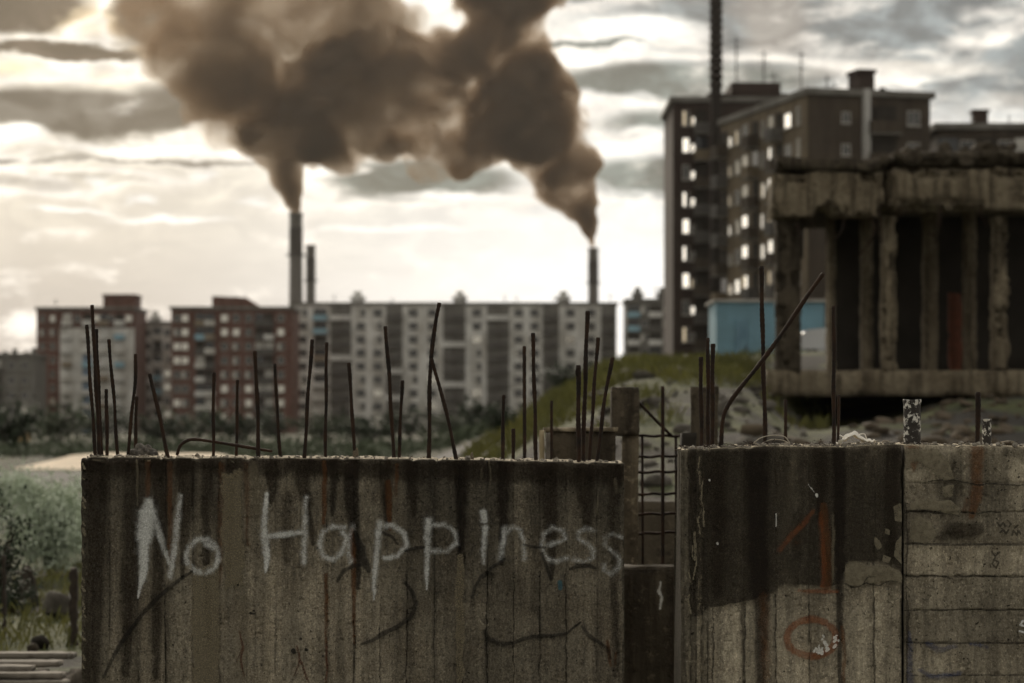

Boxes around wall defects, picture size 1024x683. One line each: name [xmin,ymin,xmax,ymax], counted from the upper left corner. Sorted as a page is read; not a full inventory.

leakage [81,458,624,683]
leakage [687,445,901,683]
spalling [845,448,961,586]